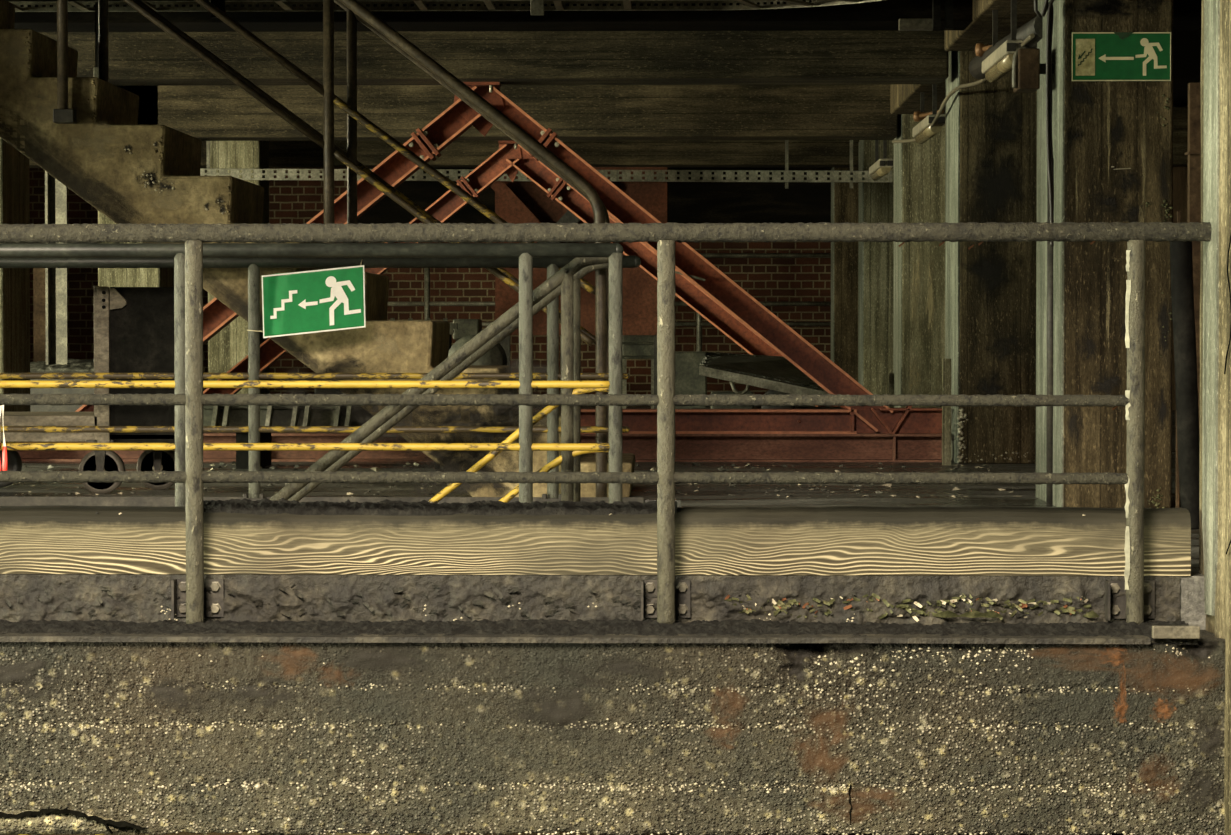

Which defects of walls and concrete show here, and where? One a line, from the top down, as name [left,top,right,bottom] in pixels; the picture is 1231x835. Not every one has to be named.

rust [1107,647,1128,723]
crack [0,808,146,834]